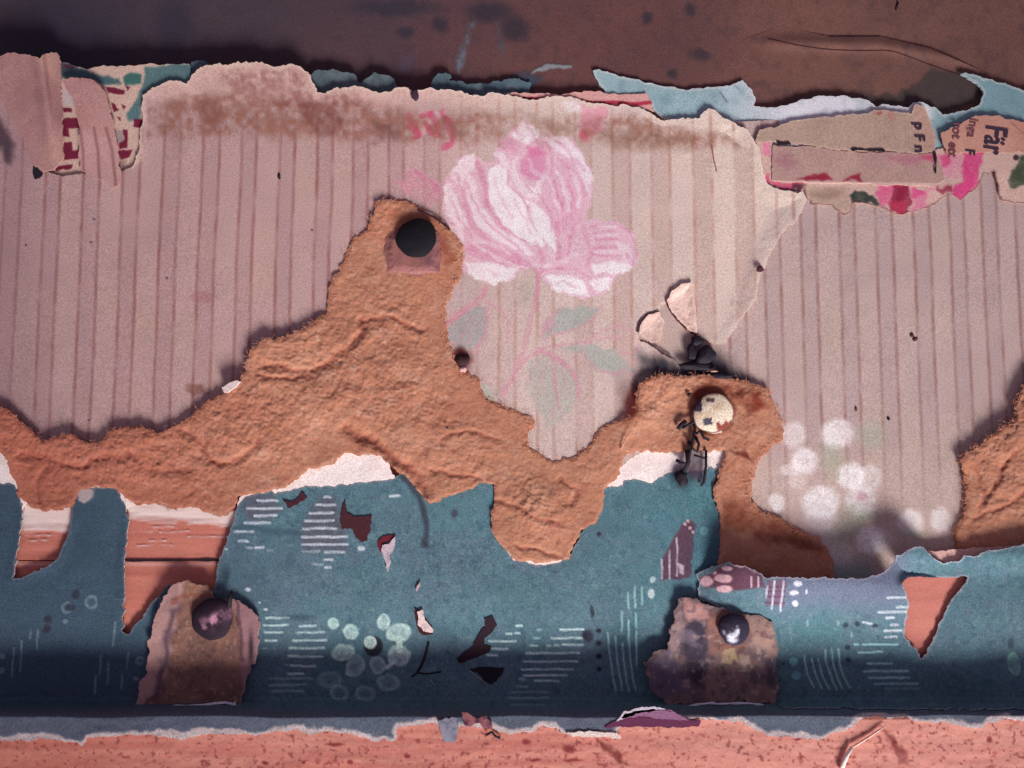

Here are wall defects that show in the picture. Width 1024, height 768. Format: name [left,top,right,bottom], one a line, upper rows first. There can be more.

peeling [0,52,122,189]
peeling [639,281,698,343]
peeling [222,380,241,393]
peeling [22,504,72,542]
peeling [128,502,236,547]
peeling [381,537,395,571]
peeling [438,711,492,742]
peeling [560,706,688,739]